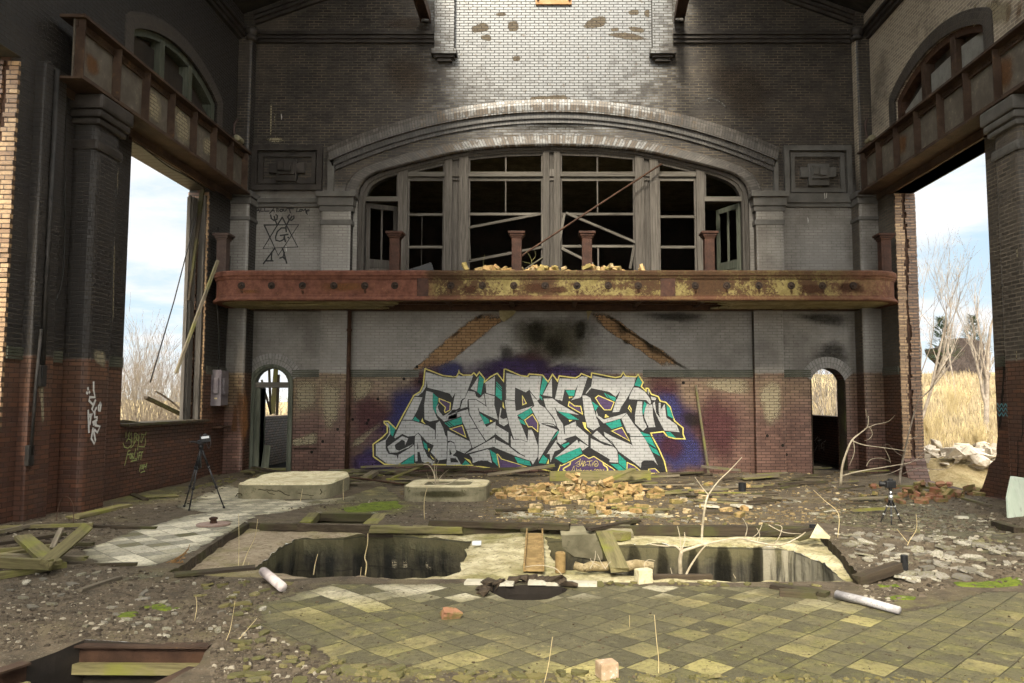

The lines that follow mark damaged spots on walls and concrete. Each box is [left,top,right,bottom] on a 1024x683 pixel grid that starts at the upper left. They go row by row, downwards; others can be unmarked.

peeling [471,12,518,41]
peeling [584,10,650,40]
rust [513,284,579,294]
leakage [516,321,588,359]